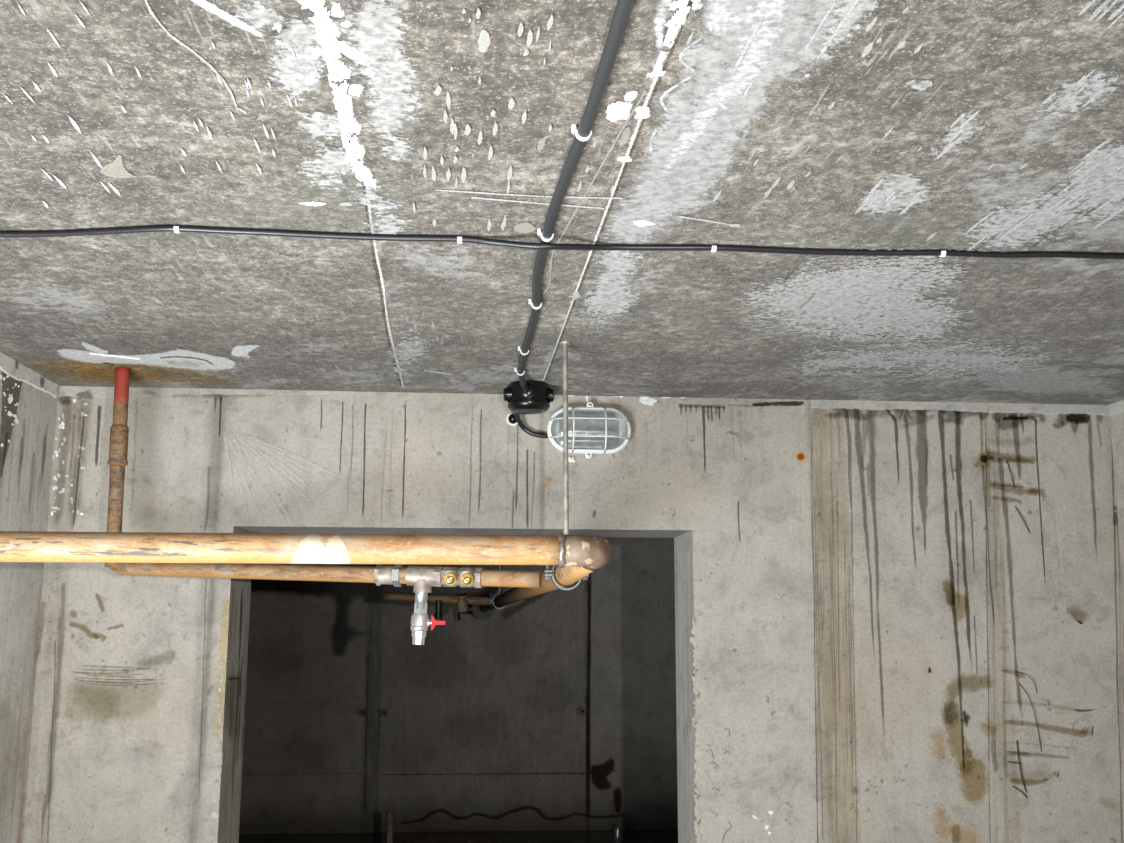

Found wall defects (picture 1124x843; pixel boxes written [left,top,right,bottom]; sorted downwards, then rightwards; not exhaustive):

damp [297,0,404,388]
damp [542,0,847,381]
damp [0,374,20,425]
damp [1066,413,1091,424]